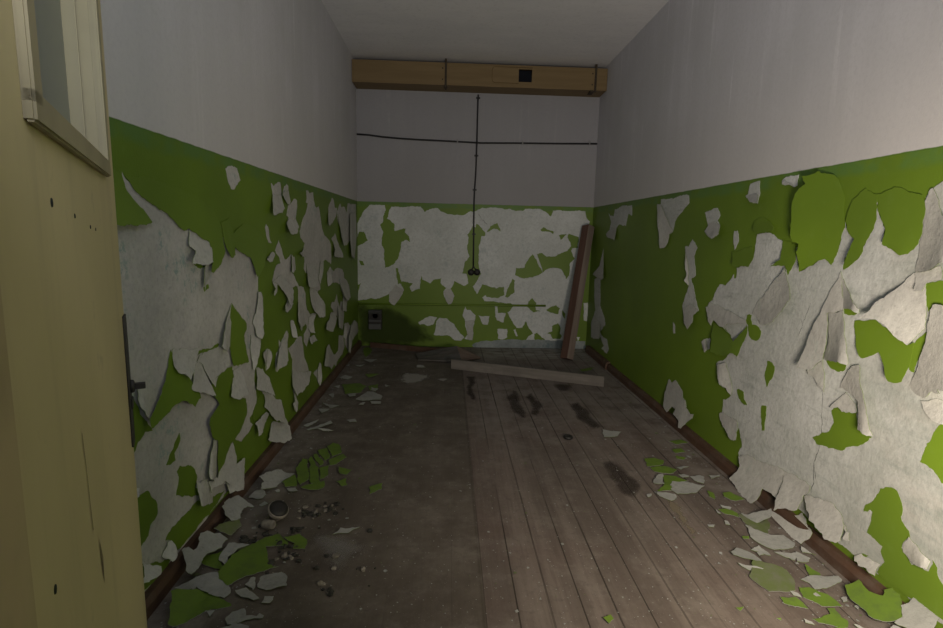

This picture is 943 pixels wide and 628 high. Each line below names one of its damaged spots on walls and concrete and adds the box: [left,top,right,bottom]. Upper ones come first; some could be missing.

peeling [606,205,632,240]
peeling [657,195,689,248]
peeling [575,253,609,353]
peeling [113,166,590,591]
peeling [663,379,694,429]
peeling [673,171,943,624]